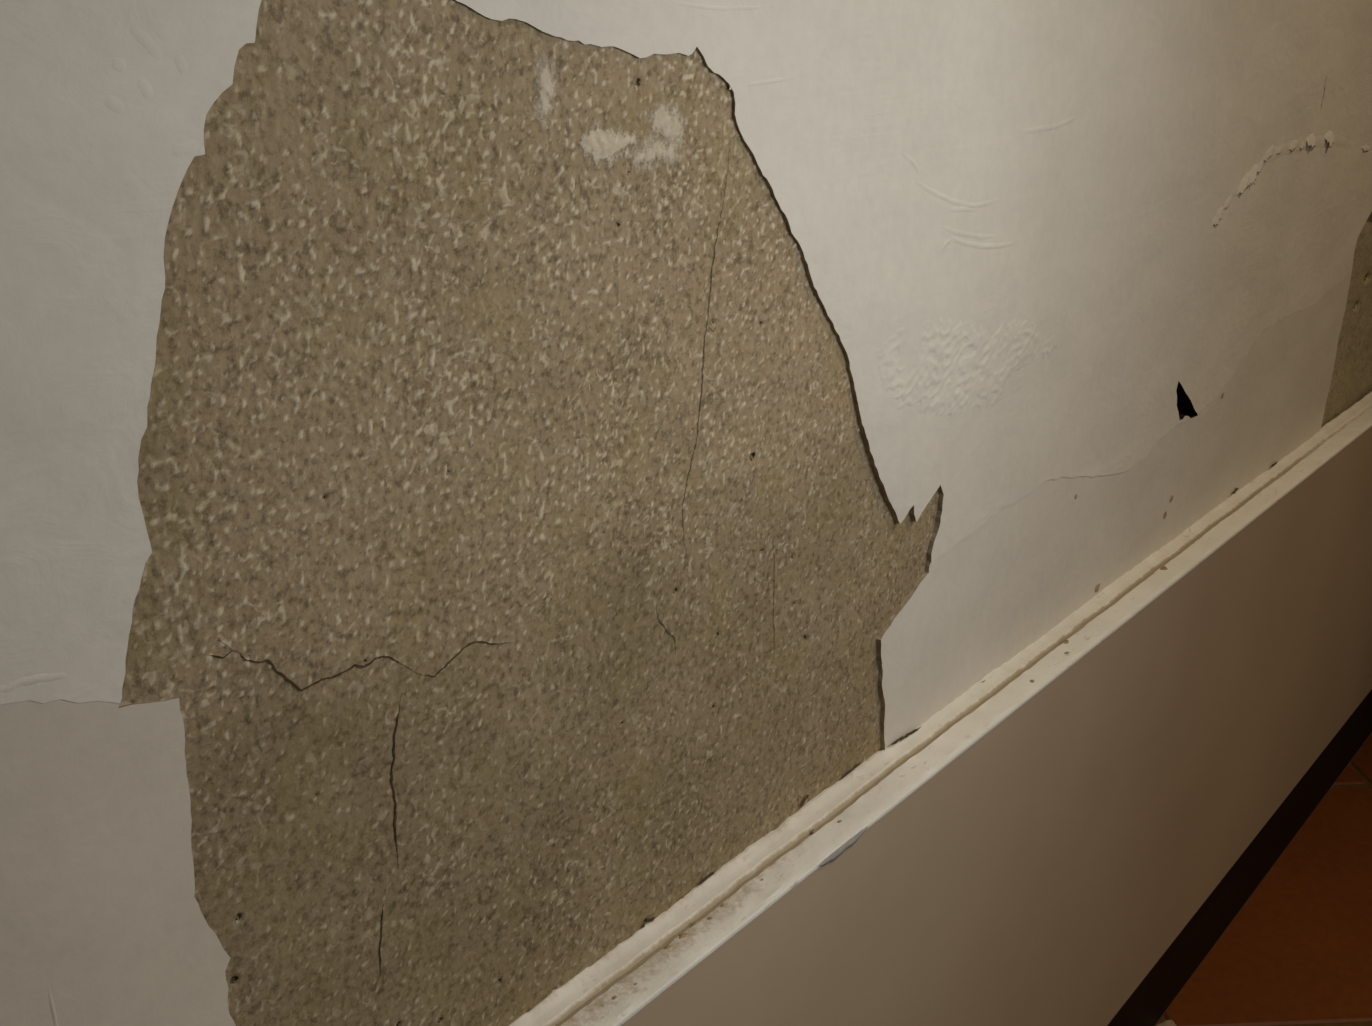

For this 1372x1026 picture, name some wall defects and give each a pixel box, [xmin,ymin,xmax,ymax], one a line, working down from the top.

spalling [0,0,944,1026]
peeling [882,212,1372,750]
crack [210,641,504,691]
crack [391,707,400,855]
crack [377,910,385,977]